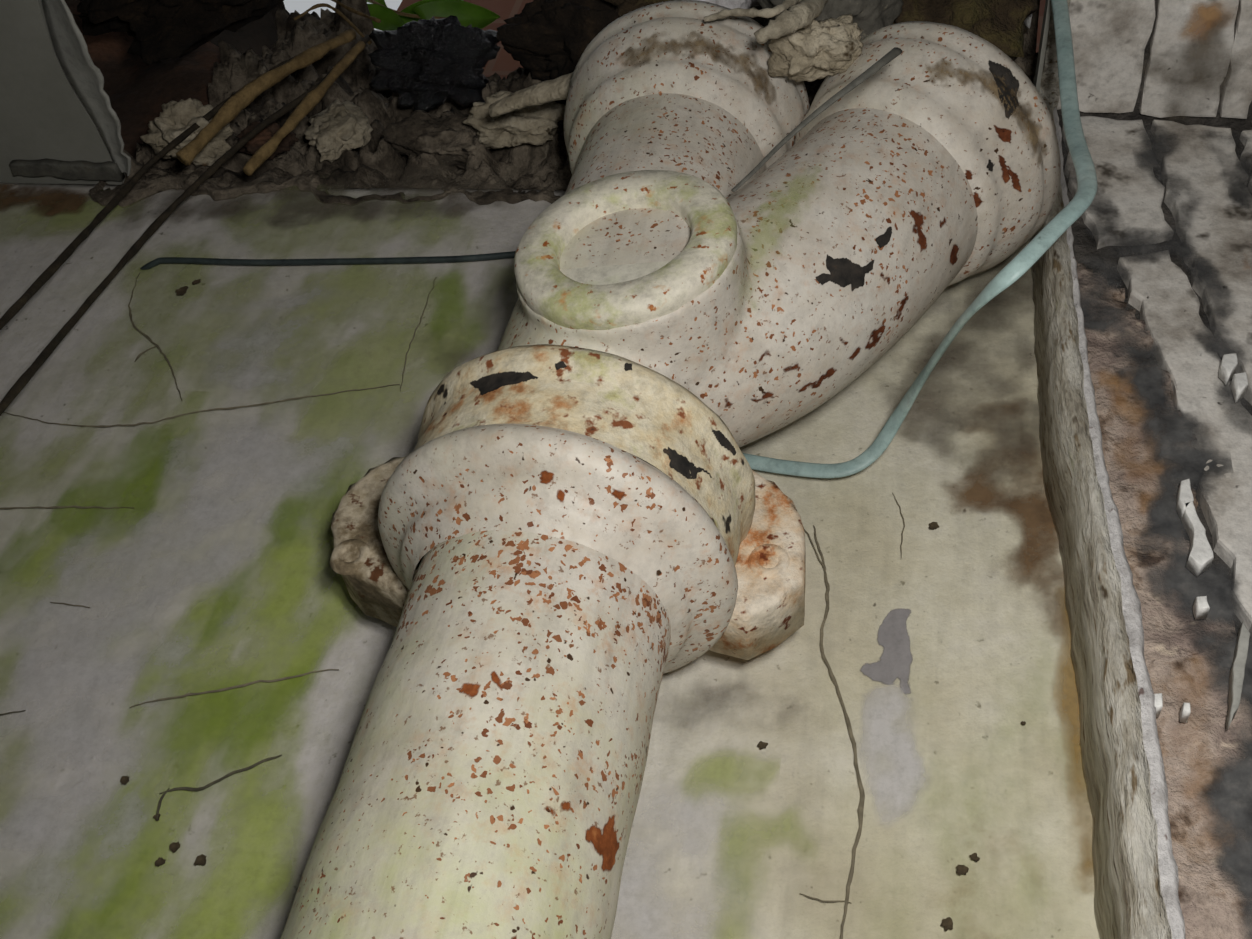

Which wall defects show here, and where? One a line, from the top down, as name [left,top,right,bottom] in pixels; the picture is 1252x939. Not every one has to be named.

peeling [816,226,892,291]
corrosion [540,471,565,502]
leakage [958,439,1063,594]
peeling [1076,260,1252,939]
corrosion [460,671,502,697]
crack [799,525,865,939]
leakage [1055,605,1084,789]
corrosion [586,815,619,871]